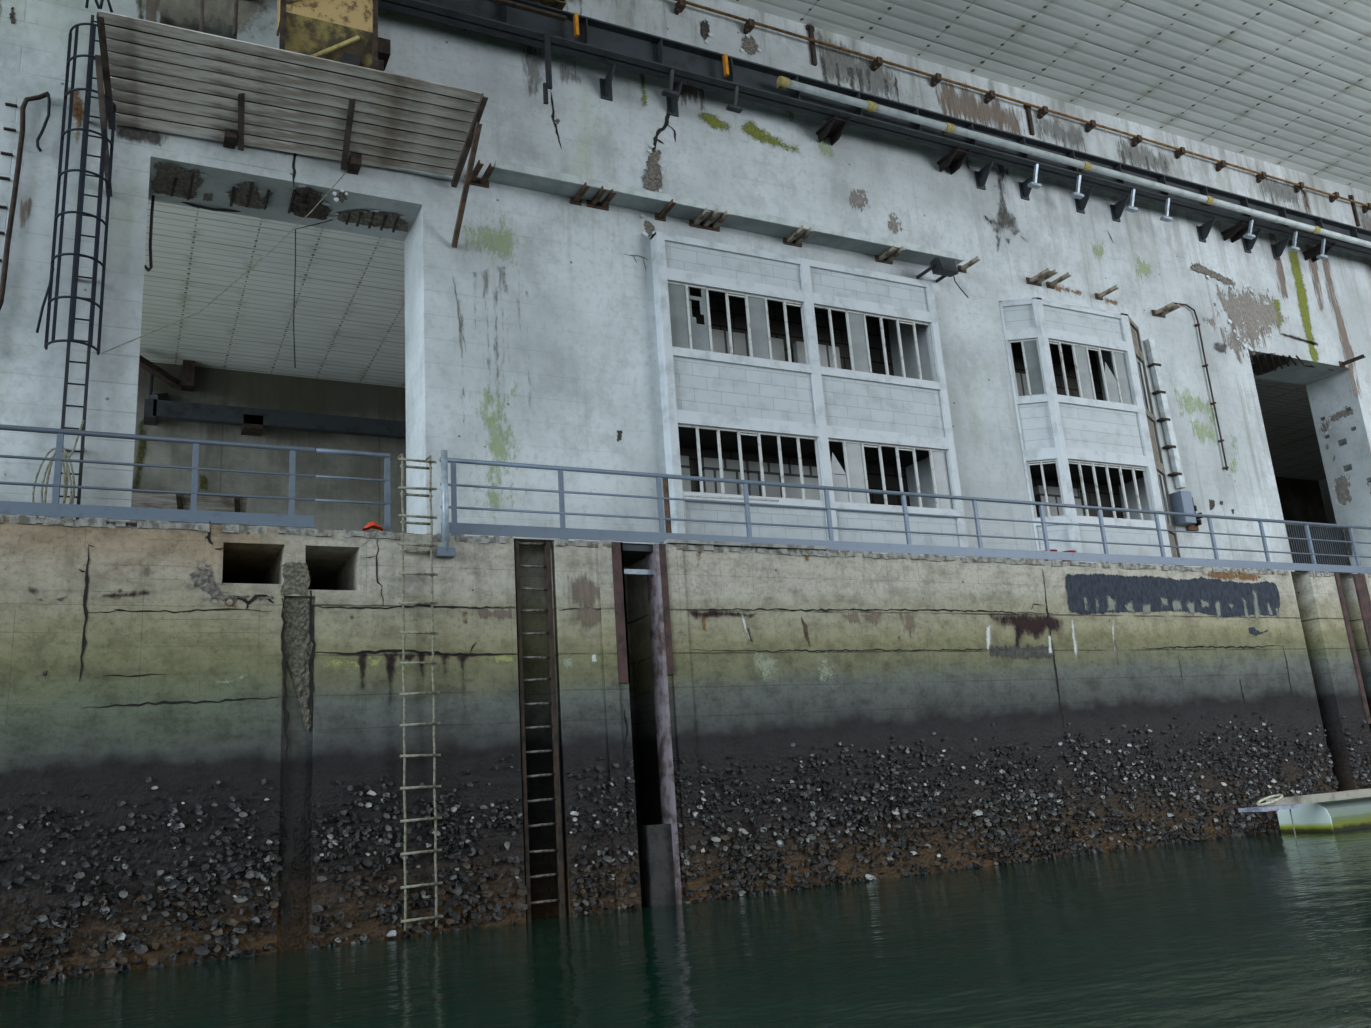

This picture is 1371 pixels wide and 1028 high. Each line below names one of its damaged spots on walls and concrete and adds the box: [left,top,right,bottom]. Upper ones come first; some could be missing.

crack [652,114,676,172]
peeling [1190,261,1304,376]
peeling [1318,406,1371,507]
damp [104,566,149,597]
spalling [188,562,310,605]
damp [572,575,600,629]
crack [79,538,516,770]
corrosion [384,653,468,687]
damp [690,610,779,681]
damp [986,614,1077,659]